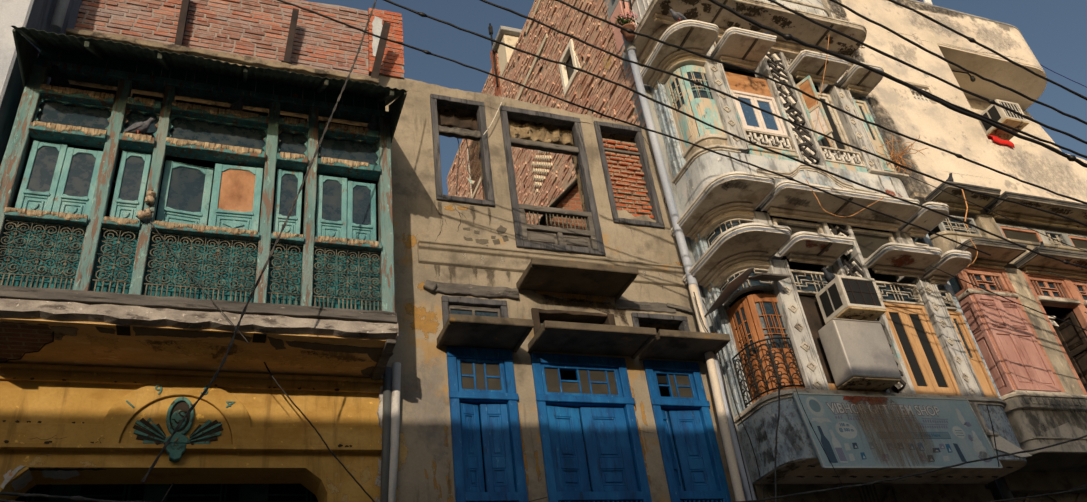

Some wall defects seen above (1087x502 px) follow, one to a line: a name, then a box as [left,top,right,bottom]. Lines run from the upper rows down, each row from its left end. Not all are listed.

damp [827,0,848,21]
damp [897,0,961,16]
damp [860,94,930,201]
spalling [0,321,79,381]
damp [756,414,802,483]
damp [1021,398,1087,441]